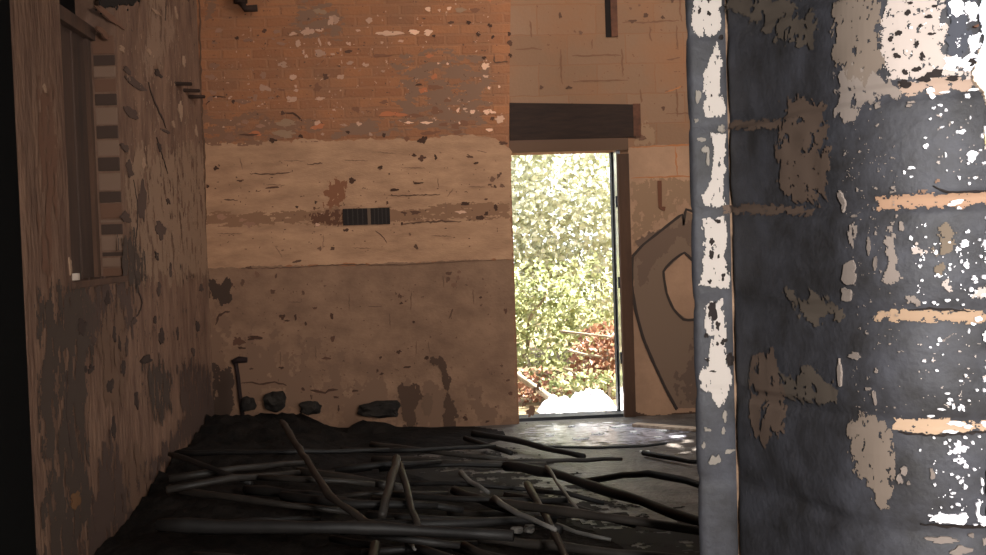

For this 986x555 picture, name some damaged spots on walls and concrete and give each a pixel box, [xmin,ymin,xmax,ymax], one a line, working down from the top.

peeling [830,0,982,124]
peeling [691,0,735,465]
peeling [841,260,857,302]
peeling [837,190,905,285]
water stain [210,300,535,428]
peeling [837,352,861,387]
peeling [847,387,910,510]
peeling [947,440,967,464]
peeling [924,499,986,555]